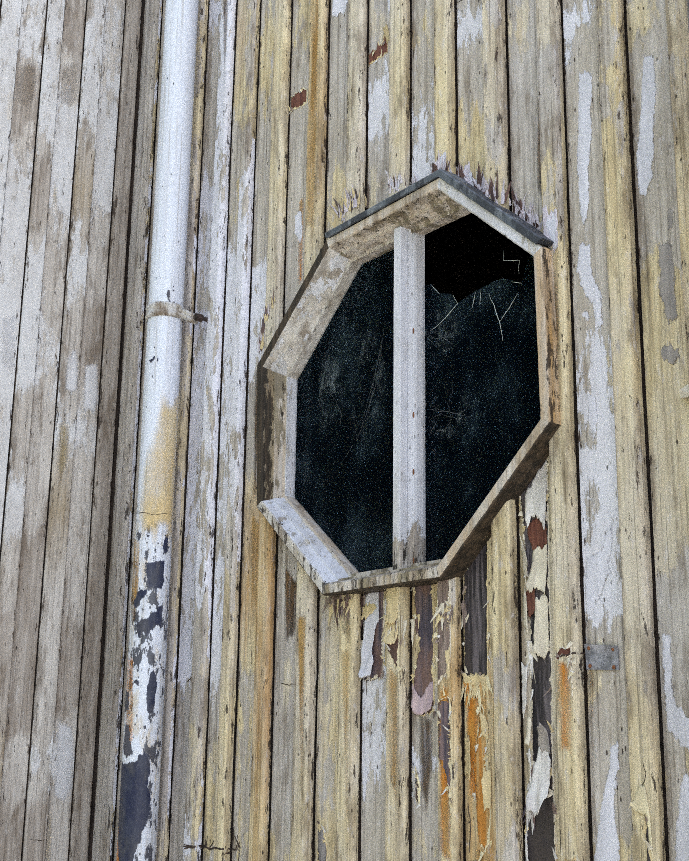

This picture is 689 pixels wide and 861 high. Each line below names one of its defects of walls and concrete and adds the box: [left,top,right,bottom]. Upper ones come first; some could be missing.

peeling [368,0,390,66]
peeling [287,87,308,116]
peeling [329,183,369,223]
peeling [385,170,417,194]
peeling [429,150,558,253]
peeling [518,456,576,861]
peeling [322,536,493,861]
crack [183,832,240,861]
peeling [316,820,328,861]